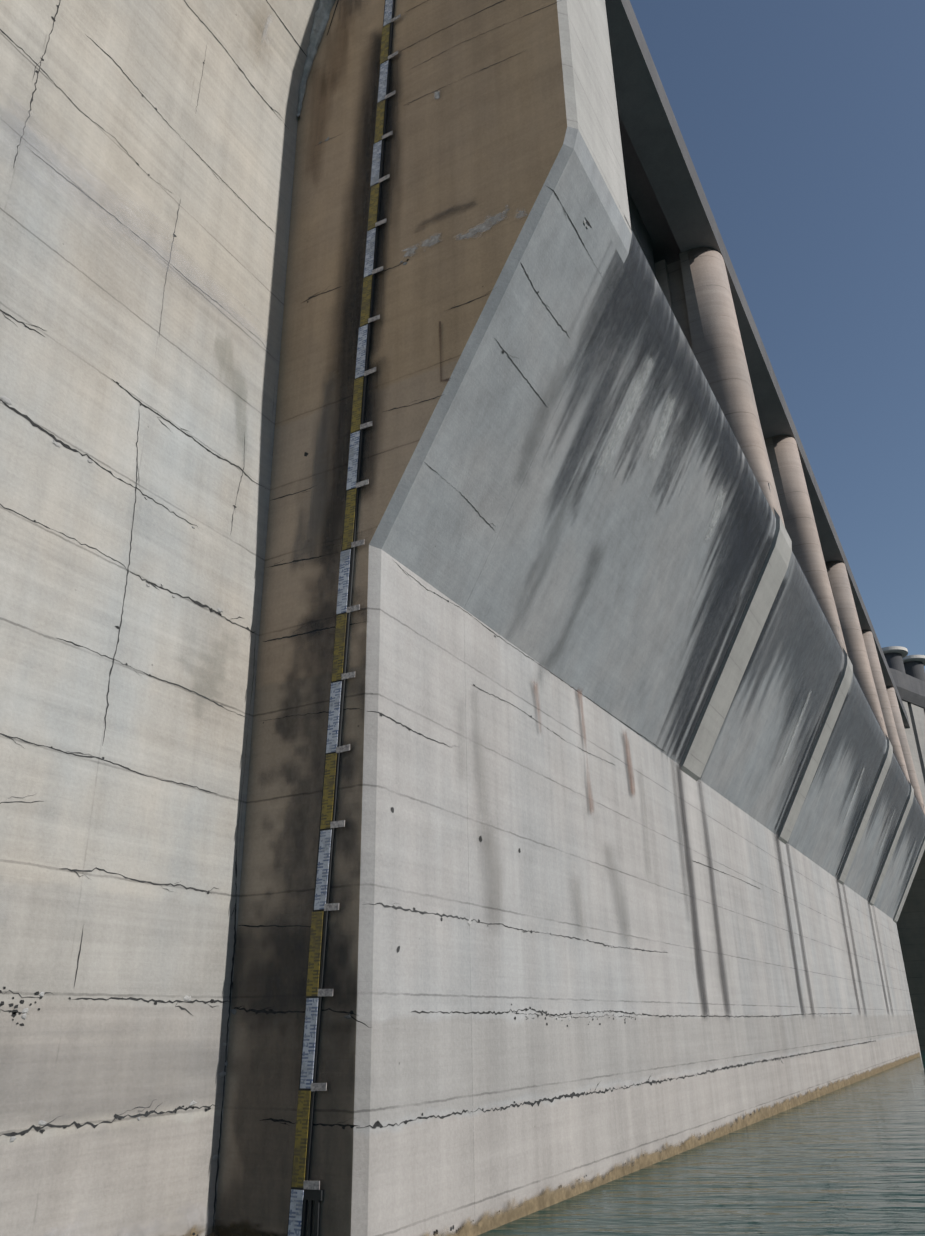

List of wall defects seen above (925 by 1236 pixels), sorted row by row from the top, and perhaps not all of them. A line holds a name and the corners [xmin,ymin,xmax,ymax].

crack [0,0,287,348]
damp [320,36,397,607]
crack [497,341,547,407]
crack [520,262,570,338]
crack [398,565,665,752]
damp [559,238,773,1014]
crack [0,379,449,1231]
damp [184,1223,280,1236]
crack [363,902,668,953]
crack [260,1041,876,1129]
crack [412,1008,852,1021]
damp [423,1052,920,1236]